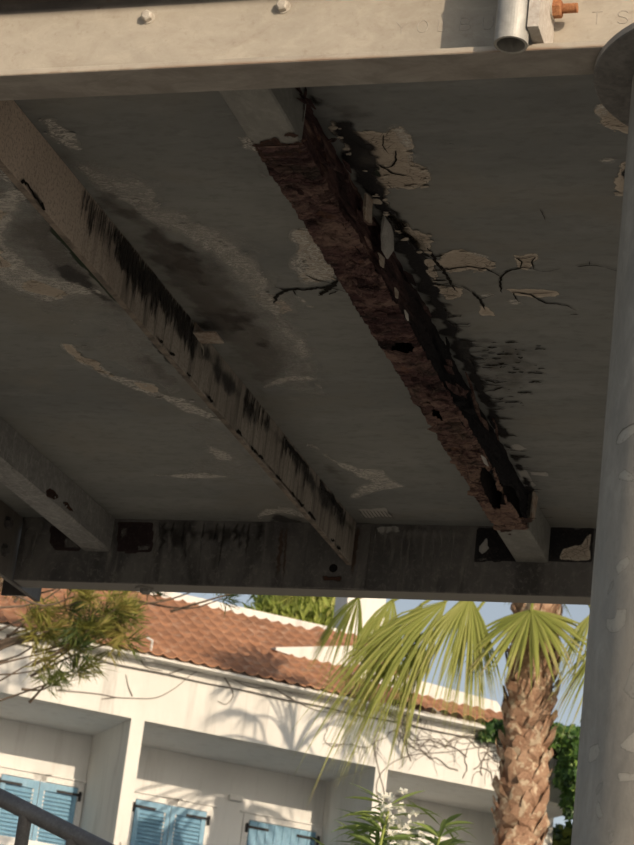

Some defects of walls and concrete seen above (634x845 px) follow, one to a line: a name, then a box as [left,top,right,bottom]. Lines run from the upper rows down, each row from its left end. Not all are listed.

peeling [0,188,101,301]
leakage [79,166,309,394]
crack [251,275,344,314]
peeling [291,227,336,283]
rust [247,87,538,535]
spalling [328,121,496,300]
leakage [334,122,545,492]
crack [421,248,578,316]
peeling [62,335,220,421]
leakage [281,436,351,528]
peeling [474,528,516,562]
peeling [548,527,594,562]